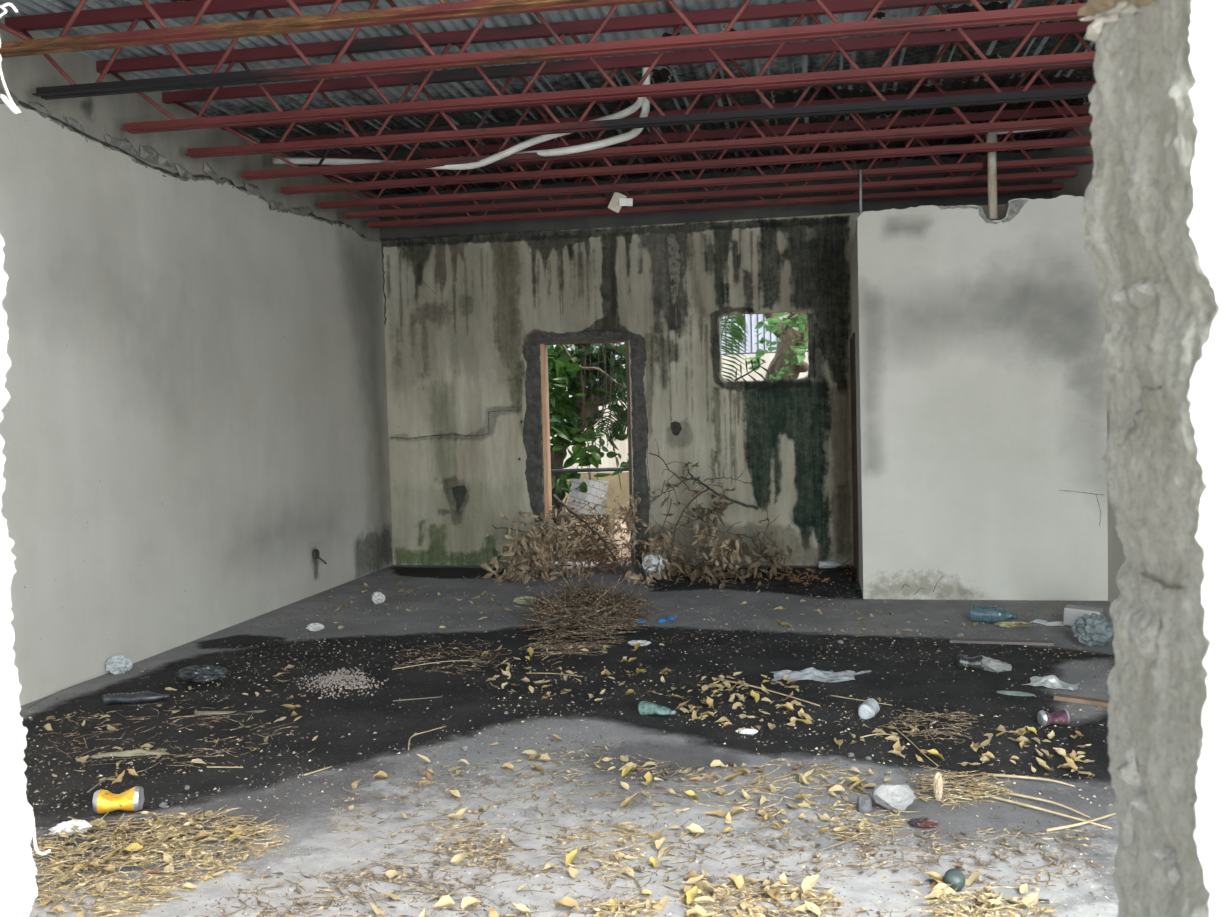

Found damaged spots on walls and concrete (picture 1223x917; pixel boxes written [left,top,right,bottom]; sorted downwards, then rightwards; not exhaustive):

flaking render [0,89,368,242]
leakage [397,242,466,310]
leakage [492,228,689,403]
leakage [711,219,850,465]
crack [389,409,522,439]
leakage [772,434,781,502]
leakage [418,522,445,554]